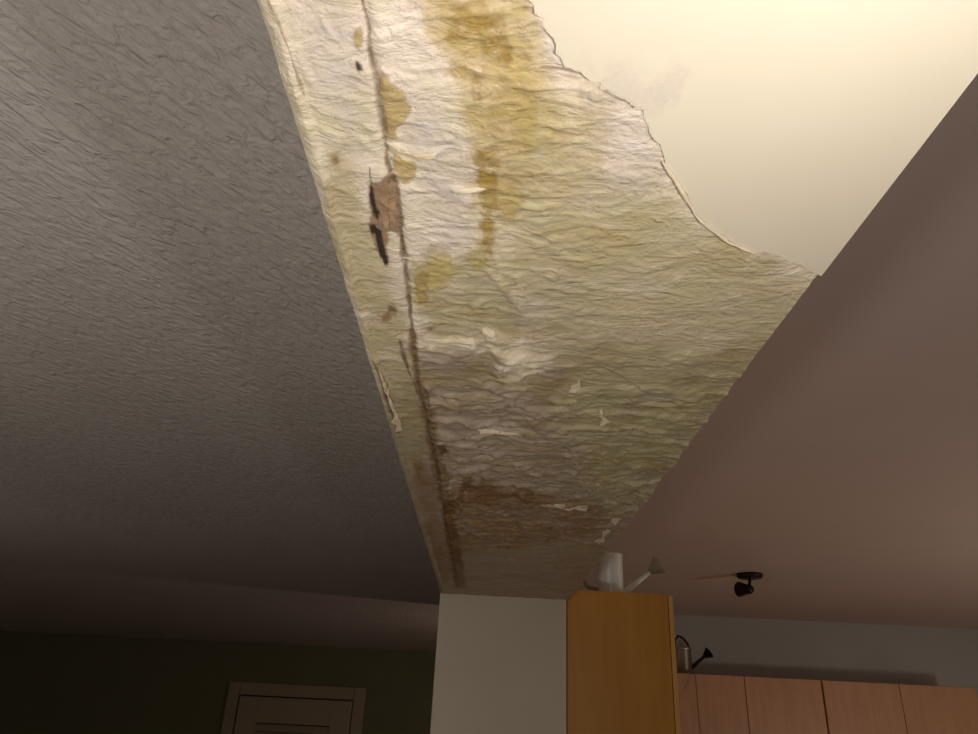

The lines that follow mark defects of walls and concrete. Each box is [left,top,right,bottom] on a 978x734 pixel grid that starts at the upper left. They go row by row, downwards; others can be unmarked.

crack [355,0,396,182]
damp [380,75,410,140]
damp [394,155,415,182]
damp [413,253,517,346]
peeling [258,0,817,600]
damp [431,0,794,513]
crack [399,216,465,588]